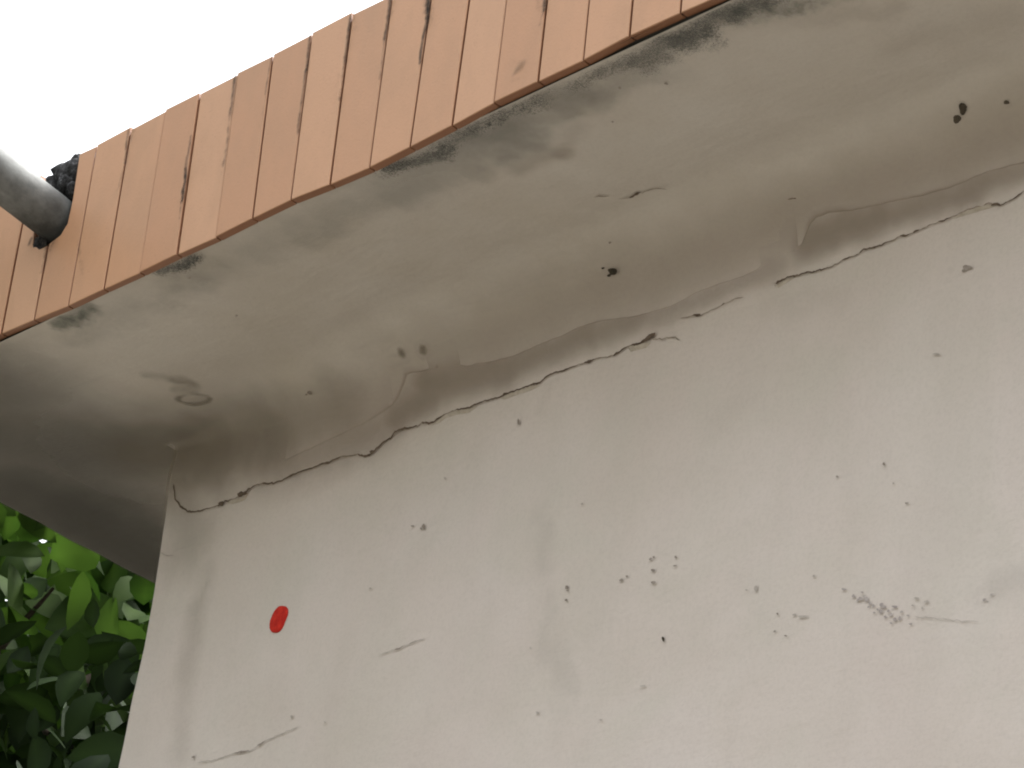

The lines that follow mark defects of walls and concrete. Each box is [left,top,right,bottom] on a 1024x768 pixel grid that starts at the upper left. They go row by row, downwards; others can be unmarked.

water stain [419,0,430,64]
crack [596,188,667,199]
crack [774,191,1024,288]
crack [173,297,743,513]
water stain [0,418,164,584]